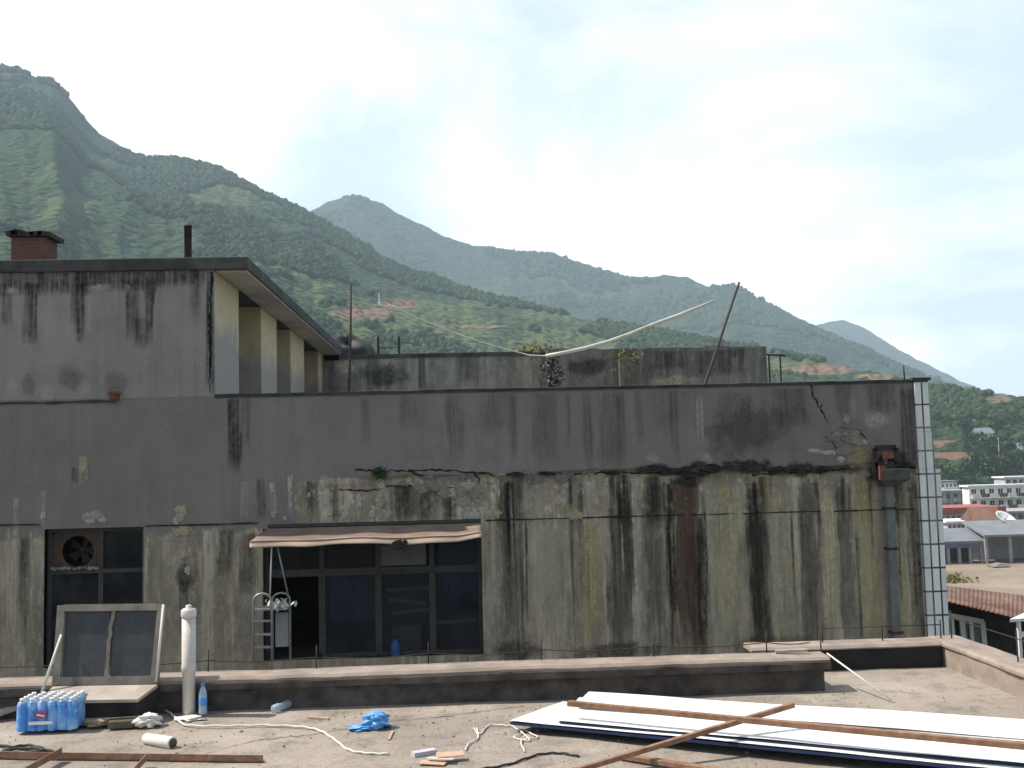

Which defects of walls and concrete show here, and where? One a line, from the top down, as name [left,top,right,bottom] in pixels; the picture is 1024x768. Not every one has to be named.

water stain [3,270,214,380]
crack [207,272,215,393]
peeling [171,503,196,575]
crack [339,468,509,492]
water stain [499,483,544,617]
crack [552,469,659,477]
water stain [568,396,915,644]
crack [752,385,866,477]
spalling [806,413,868,463]
water stain [894,487,925,631]